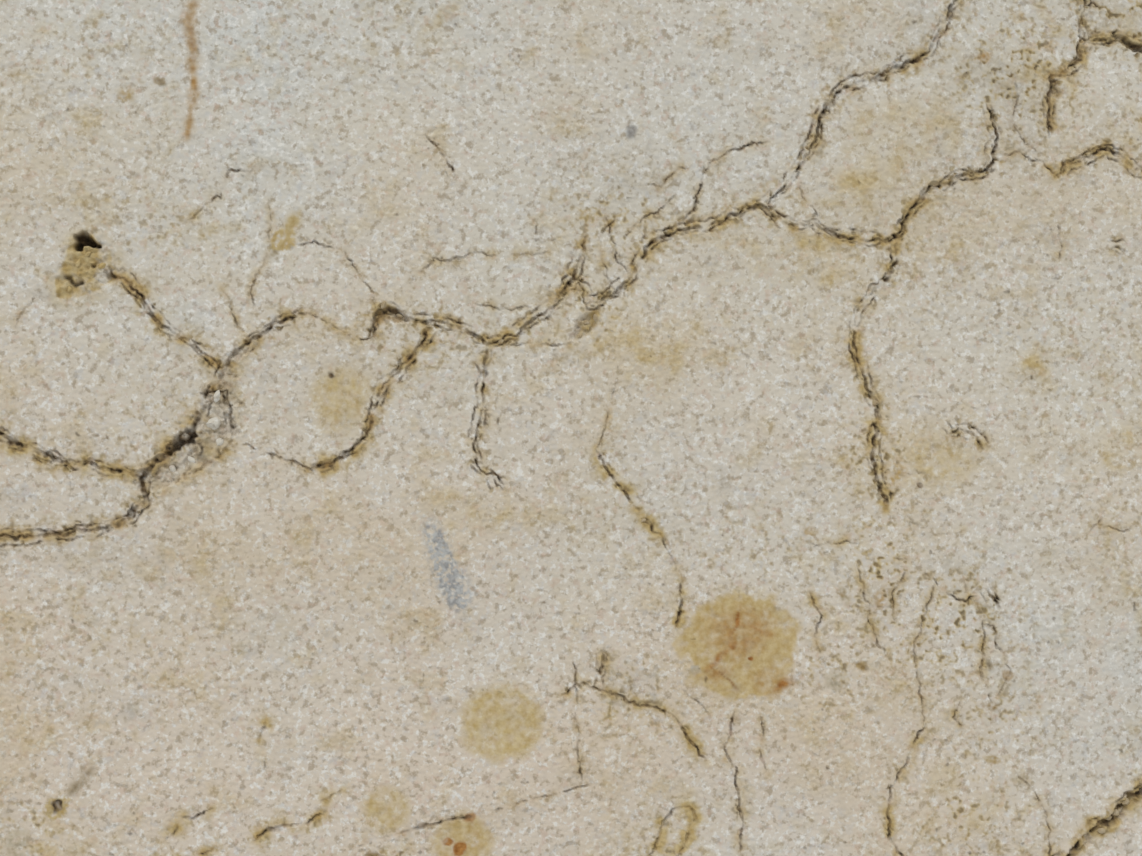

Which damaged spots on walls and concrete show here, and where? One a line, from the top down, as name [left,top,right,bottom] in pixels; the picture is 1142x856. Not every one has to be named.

corrosion [181,0,207,143]
spalling [51,230,118,305]
crack [0,0,1142,550]
spalling [135,337,250,496]
crack [594,380,686,630]
crack [258,720,269,741]
crack [251,788,342,844]
corrosion [426,807,501,856]
water stain [455,679,548,768]
crack [334,646,771,856]
crack [800,539,1013,856]
crack [1005,761,1142,856]